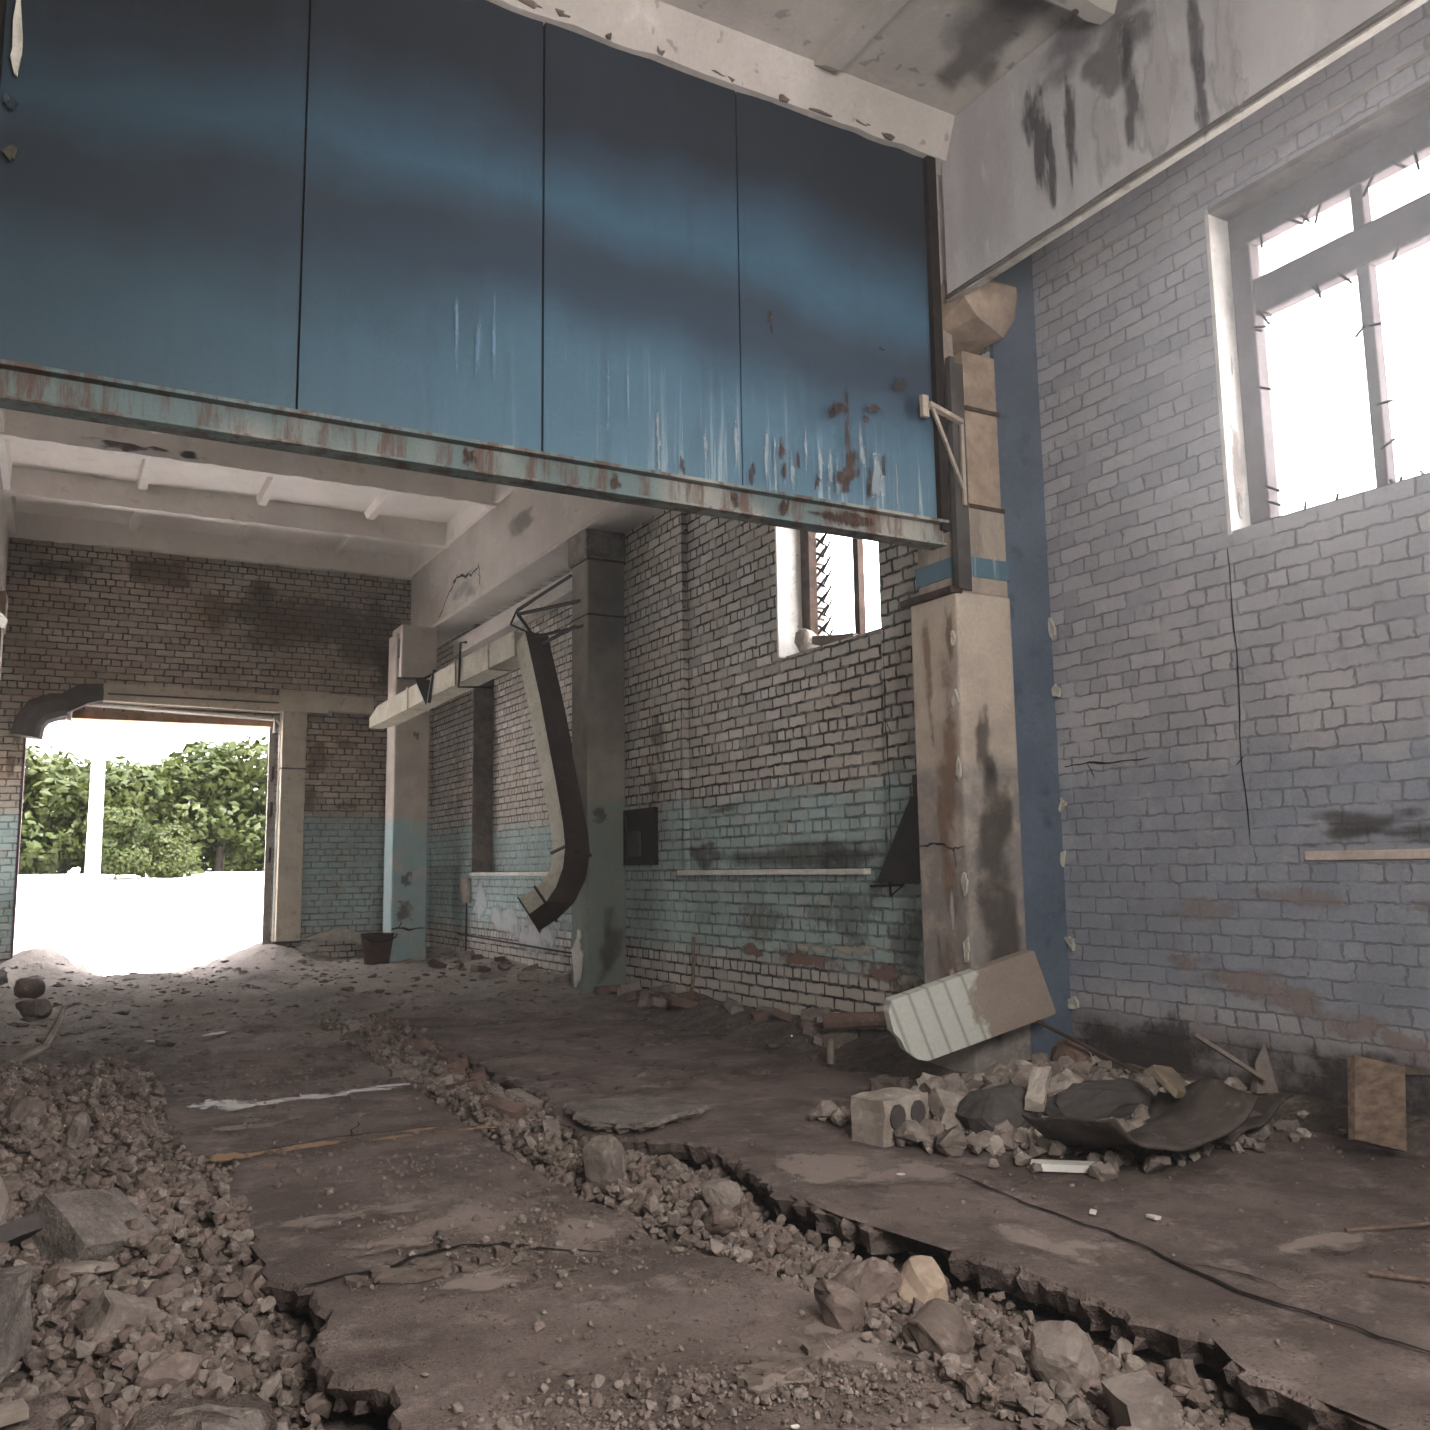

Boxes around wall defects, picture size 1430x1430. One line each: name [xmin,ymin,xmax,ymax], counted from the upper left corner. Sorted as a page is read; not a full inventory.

leakage [1093,0,1248,175]
leakage [1023,83,1077,206]
rust [463,448,477,465]
peeling [764,430,840,495]
peeling [859,423,899,512]
rust [811,510,872,527]
leakage [130,561,189,588]
leakage [205,582,397,687]
leakage [977,720,1018,960]
leakage [1325,812,1392,838]
crack [954,1173,1430,1353]